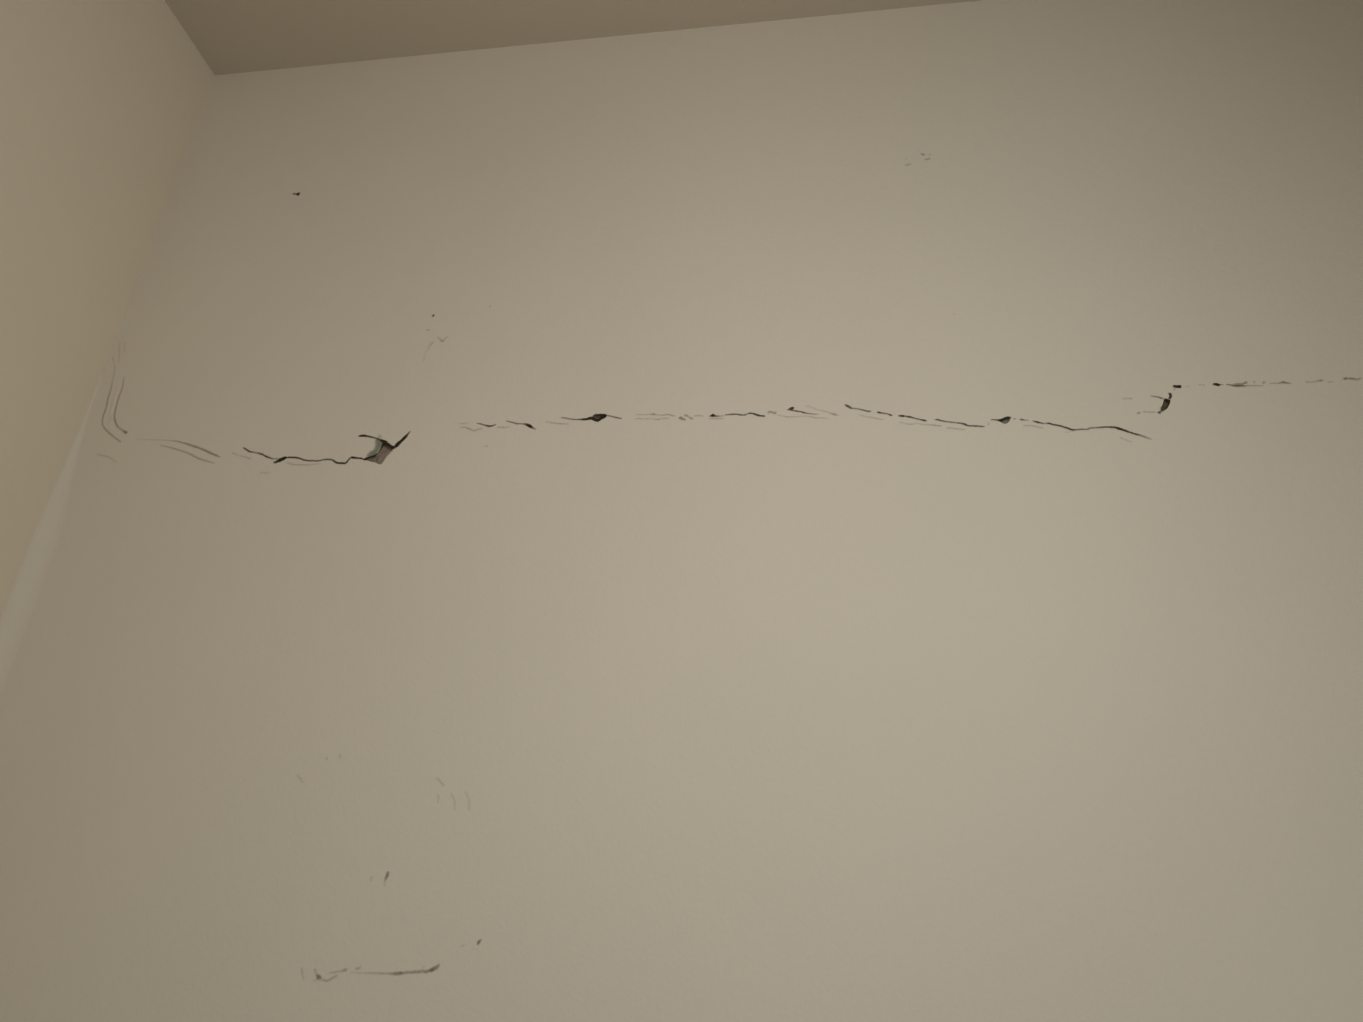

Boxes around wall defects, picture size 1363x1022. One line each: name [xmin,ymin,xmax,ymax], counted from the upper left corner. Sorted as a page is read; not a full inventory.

crack [1213,381,1288,390]
crack [710,407,805,419]
crack [846,405,983,428]
crack [1021,419,1139,439]
crack [244,447,350,464]
spalling [351,432,411,467]